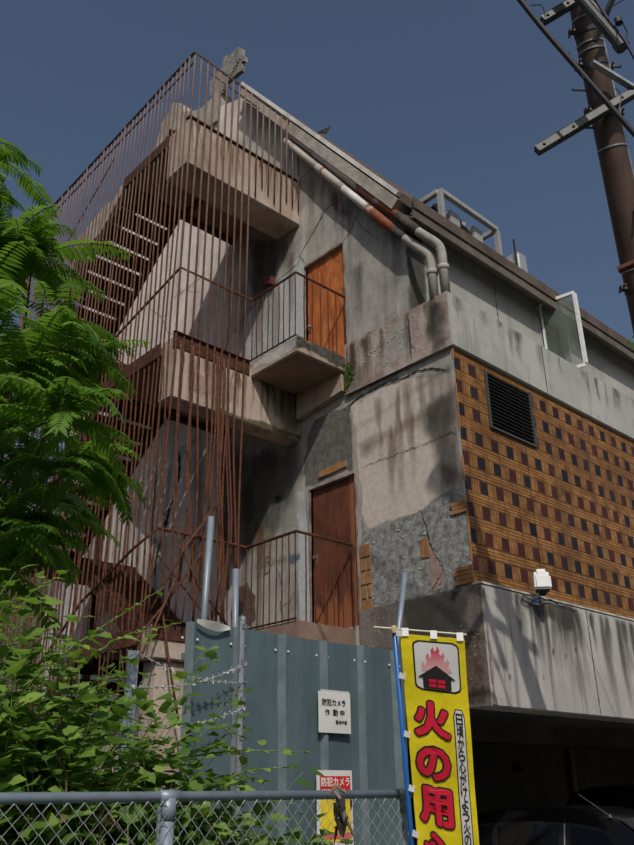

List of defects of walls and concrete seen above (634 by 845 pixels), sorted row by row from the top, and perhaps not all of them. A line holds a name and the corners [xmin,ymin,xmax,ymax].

crack [347,319,450,425]
crack [363,431,456,468]
peeling [297,373,470,622]
crack [421,512,445,589]
water stain [516,595,580,647]
water stain [606,619,634,649]